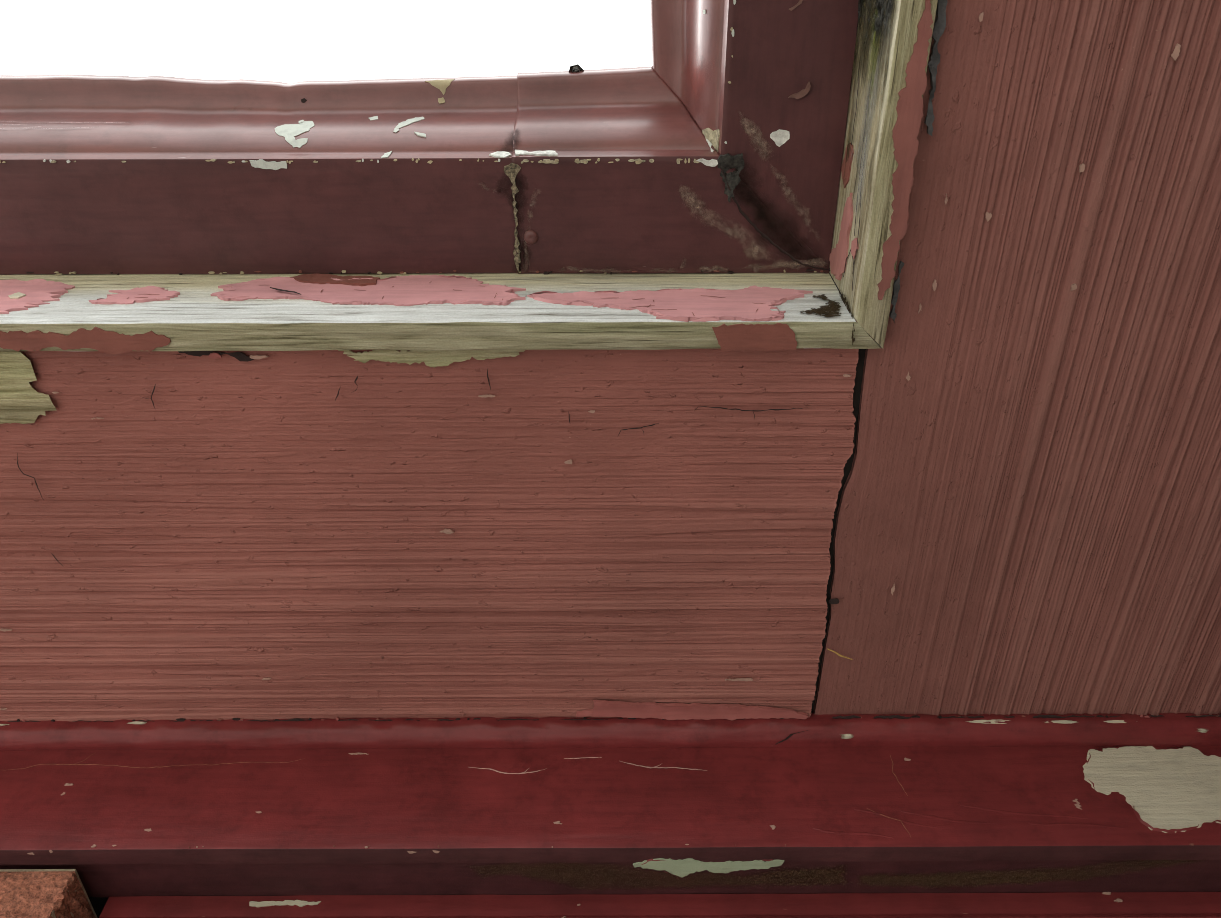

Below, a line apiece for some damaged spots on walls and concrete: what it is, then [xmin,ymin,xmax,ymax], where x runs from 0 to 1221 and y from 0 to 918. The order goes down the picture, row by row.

damp [846,0,895,188]
peeling [205,120,315,170]
peeling [877,0,933,300]
peeling [806,143,859,280]
peeling [0,271,76,314]
peeling [89,286,180,305]
peeling [208,270,813,352]
peeling [0,327,171,424]
peeling [338,350,525,367]
peeling [958,715,1026,724]
peeling [1083,745,1221,846]
peeling [633,844,786,878]